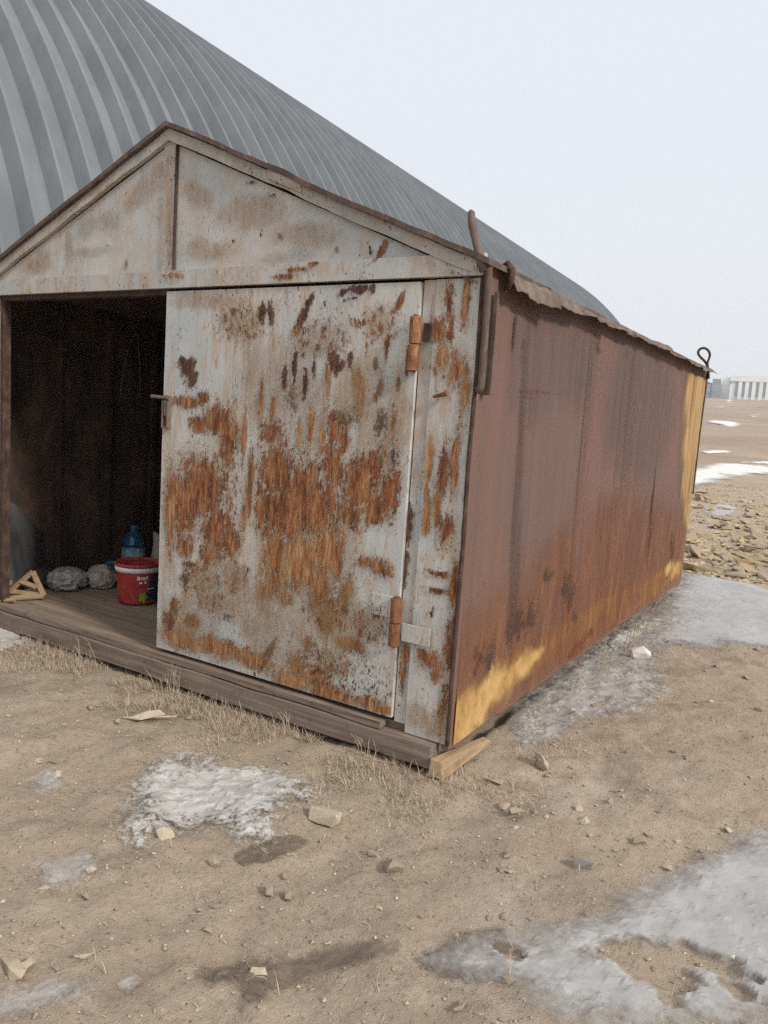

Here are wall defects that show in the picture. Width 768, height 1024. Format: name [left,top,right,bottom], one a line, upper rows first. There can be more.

rust [373,239,389,262]
rust [270,261,318,280]
rust [157,269,478,734]